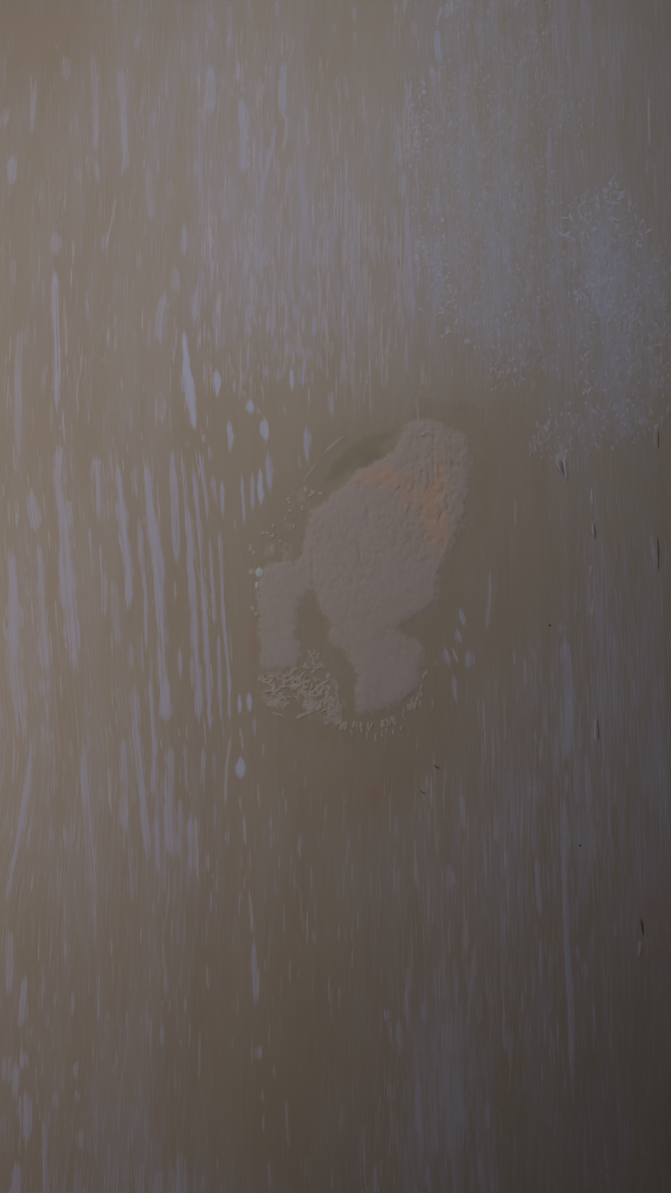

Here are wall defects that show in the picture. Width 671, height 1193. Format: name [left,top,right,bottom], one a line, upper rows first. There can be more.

peeling [249,420,471,742]